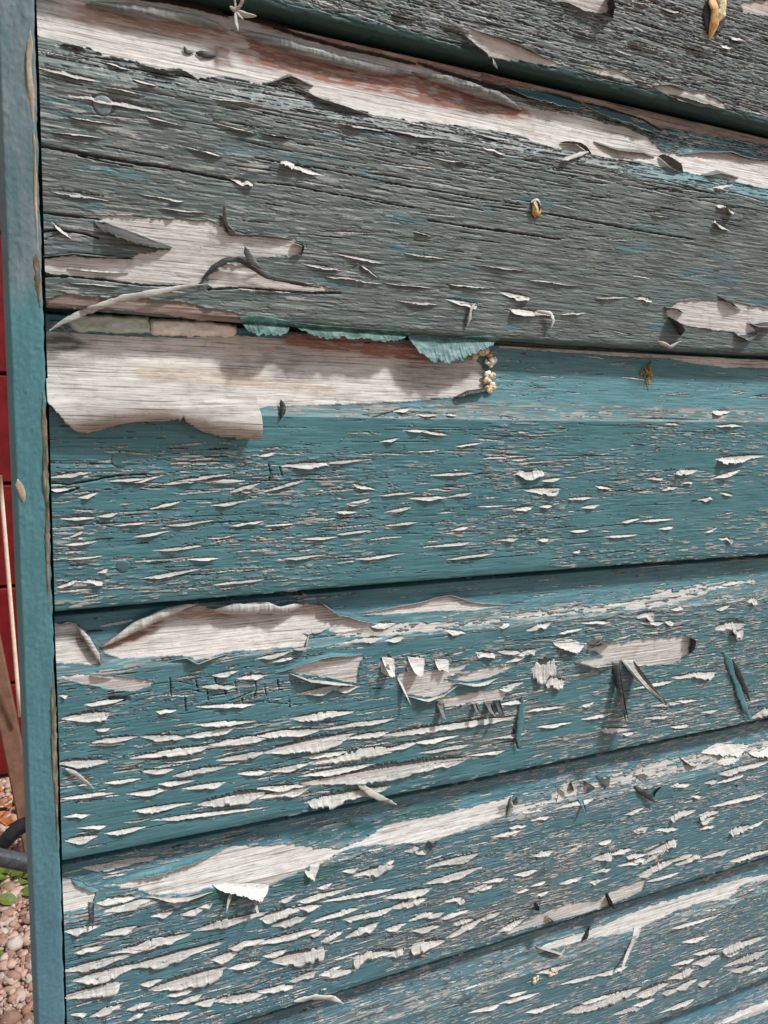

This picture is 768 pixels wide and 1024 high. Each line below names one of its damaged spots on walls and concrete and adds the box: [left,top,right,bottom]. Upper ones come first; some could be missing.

peeling [26,0,768,309]
peeling [665,296,768,341]
peeling [41,331,501,610]
peeling [516,470,597,511]
peeling [649,469,696,491]
peeling [713,456,760,479]
peeling [609,519,673,538]
peeling [50,579,756,847]
peeling [62,740,768,1024]